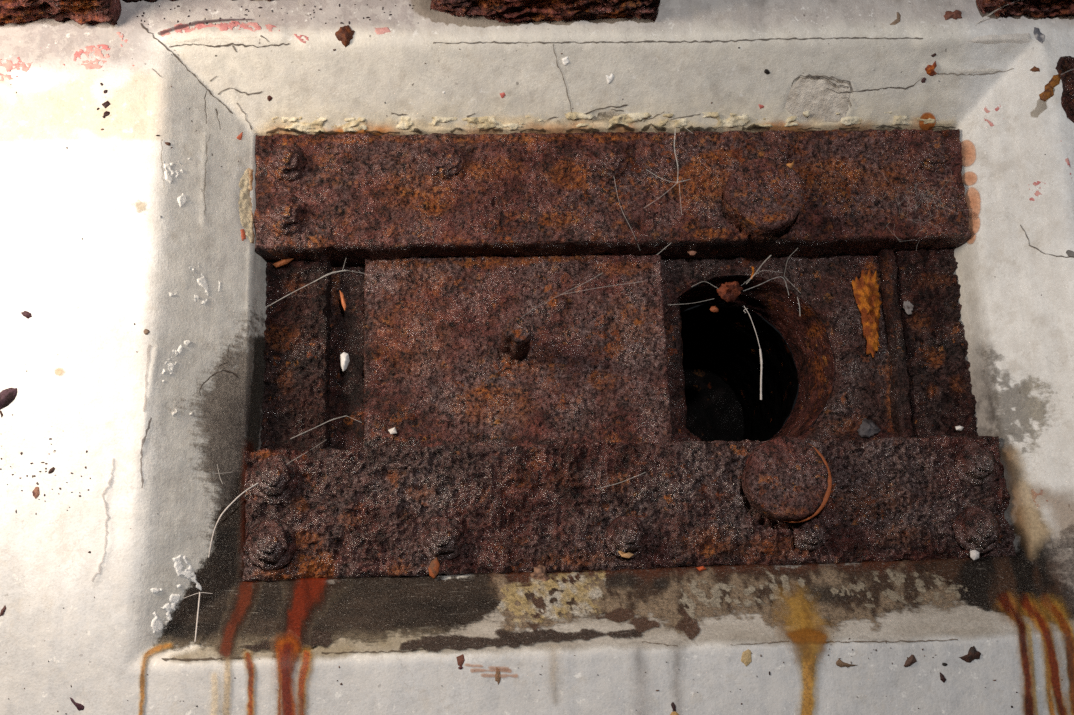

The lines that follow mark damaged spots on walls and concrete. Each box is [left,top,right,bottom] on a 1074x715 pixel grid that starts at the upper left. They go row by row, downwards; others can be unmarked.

crack [140,19,289,215]
corrosion [961,140,980,244]
corrosion [852,269,882,358]
water stain [181,312,266,541]
water stain [1002,450,1074,552]
corrosion [139,643,172,715]
water stain [174,642,277,659]
corrosion [220,499,256,715]
corrosion [276,577,331,715]
water stain [297,568,1074,658]
corrosion [781,592,826,715]
corrosion [999,594,1074,715]